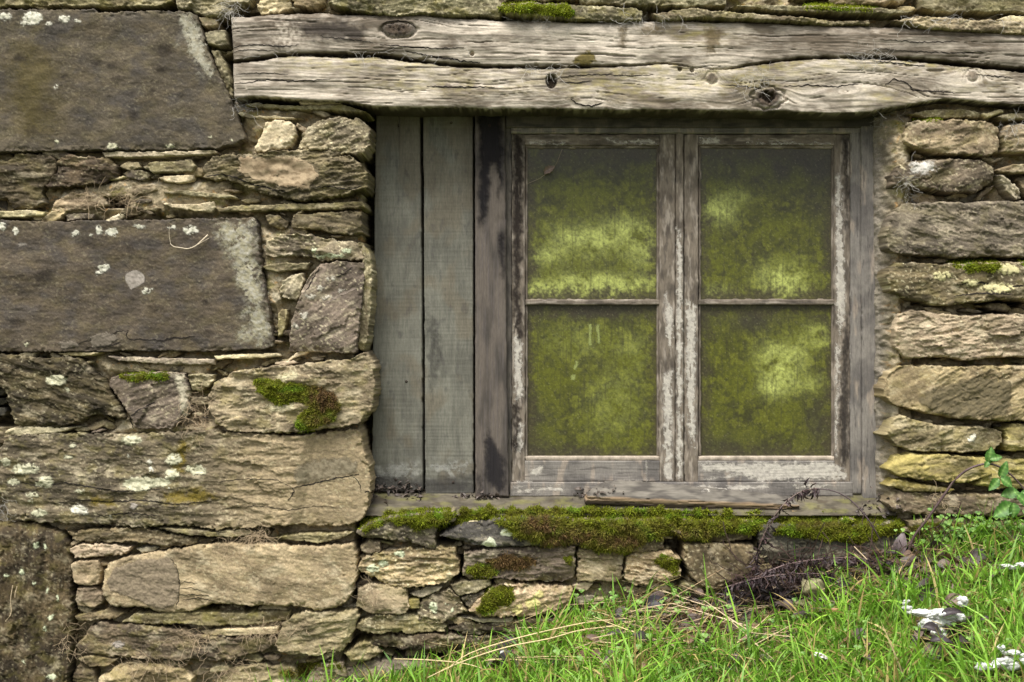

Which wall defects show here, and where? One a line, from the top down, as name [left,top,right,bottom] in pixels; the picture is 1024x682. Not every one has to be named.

crack [22,474,361,517]
water stain [476,116,524,339]
water stain [512,405,521,451]
peeling [513,335,523,400]
peeling [662,230,697,480]
peeling [698,175,847,491]